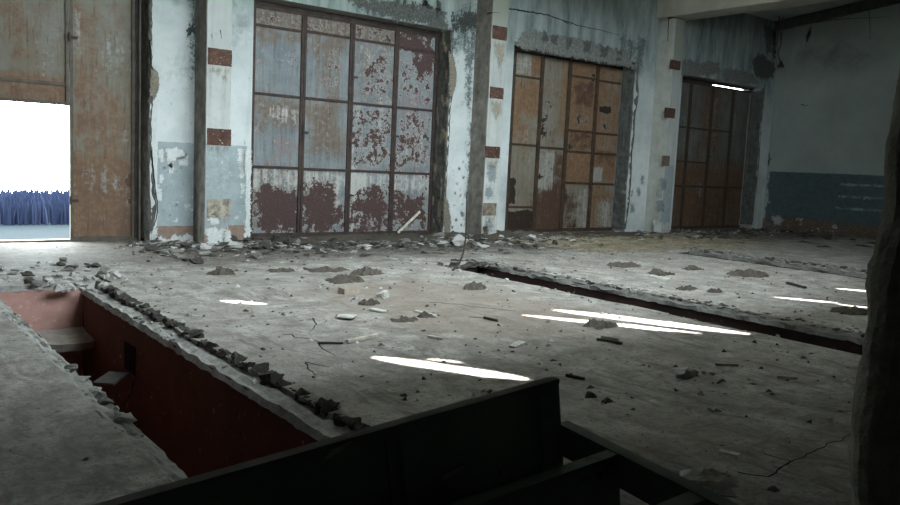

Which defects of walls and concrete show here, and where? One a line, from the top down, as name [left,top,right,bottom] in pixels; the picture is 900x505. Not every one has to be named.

crack [487,8,618,35]
flaking render [140,0,190,243]
peeling [237,147,253,238]
peeling [206,217,232,244]
crack [738,434,850,477]